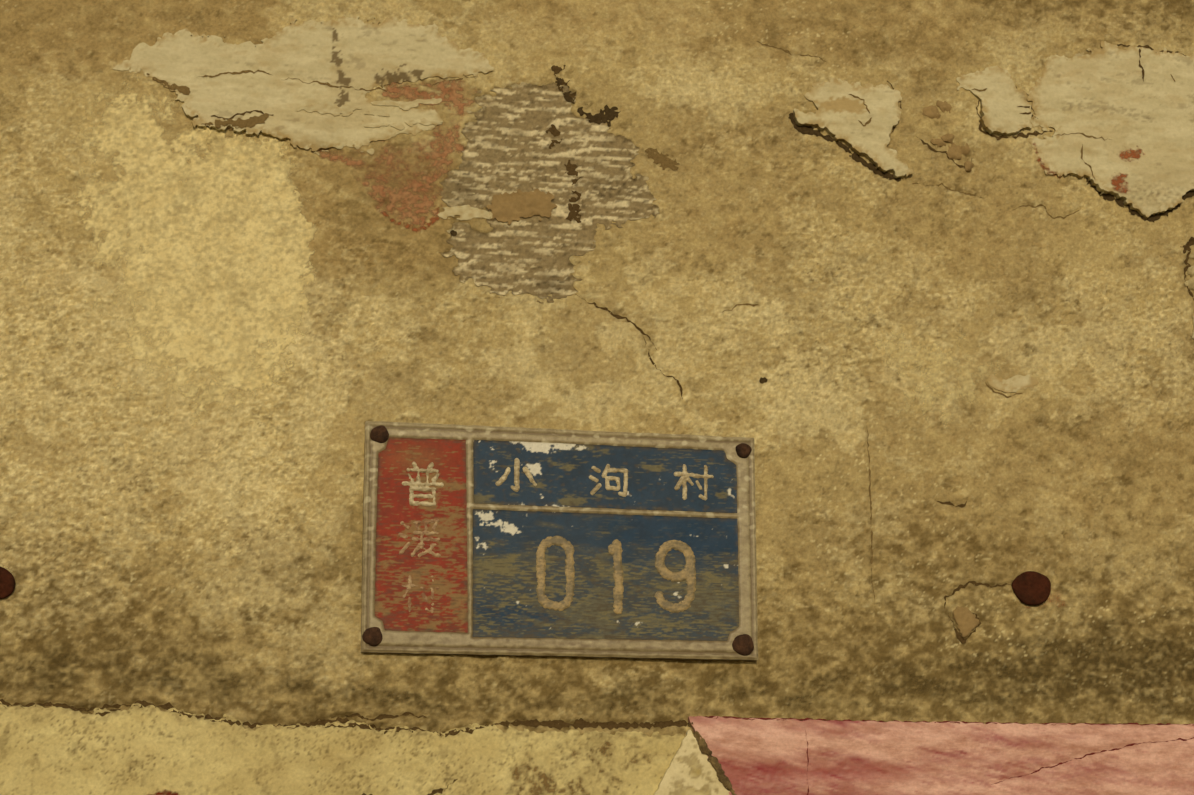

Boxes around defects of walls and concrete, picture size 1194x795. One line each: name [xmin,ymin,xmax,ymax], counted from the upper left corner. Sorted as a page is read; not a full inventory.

peeling [113,15,679,303]
peeling [788,78,914,182]
spalling [922,100,952,119]
spalling [916,133,974,172]
peeling [956,41,1194,222]
spalling [1180,237,1194,290]
crack [575,294,683,399]
crack [944,581,1010,644]